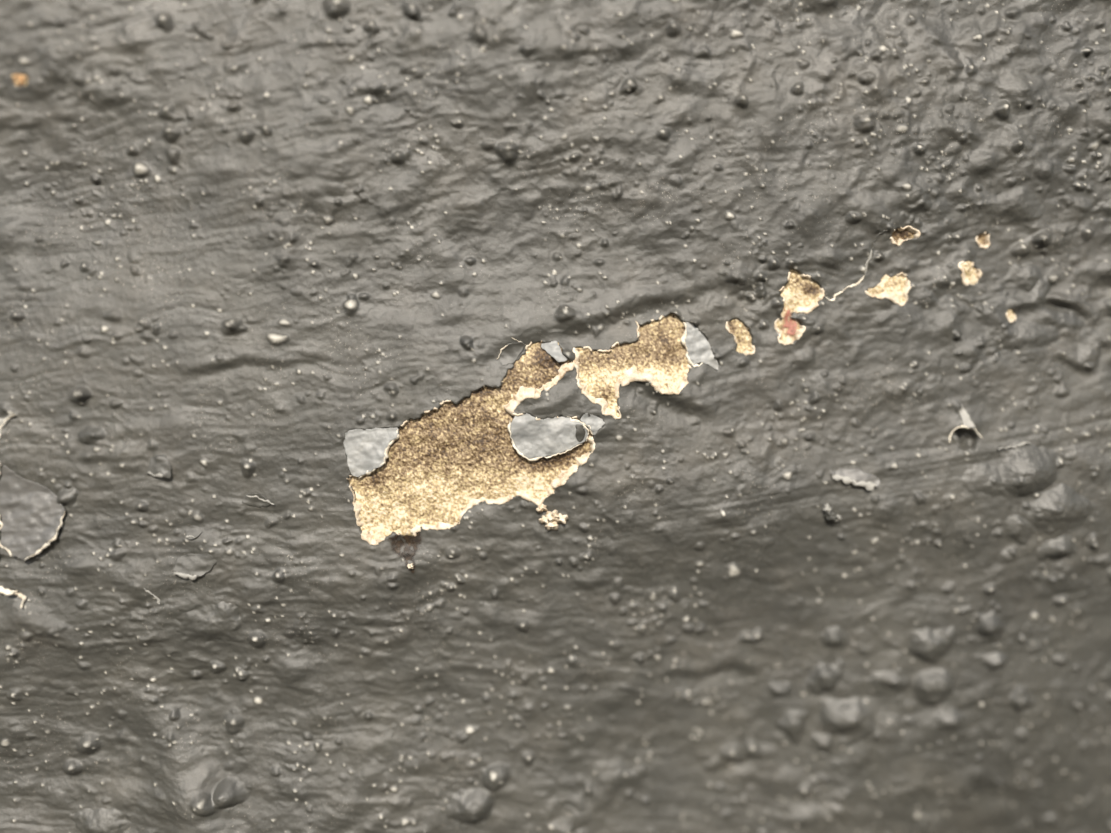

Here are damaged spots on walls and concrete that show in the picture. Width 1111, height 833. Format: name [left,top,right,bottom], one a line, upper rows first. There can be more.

peeling [890,226,921,246]
peeling [975,232,990,249]
peeling [865,272,911,306]
peeling [958,261,982,286]
peeling [774,270,825,346]
peeling [725,319,755,356]
peeling [343,314,719,545]
peeling [0,465,66,561]
peeling [0,586,26,608]